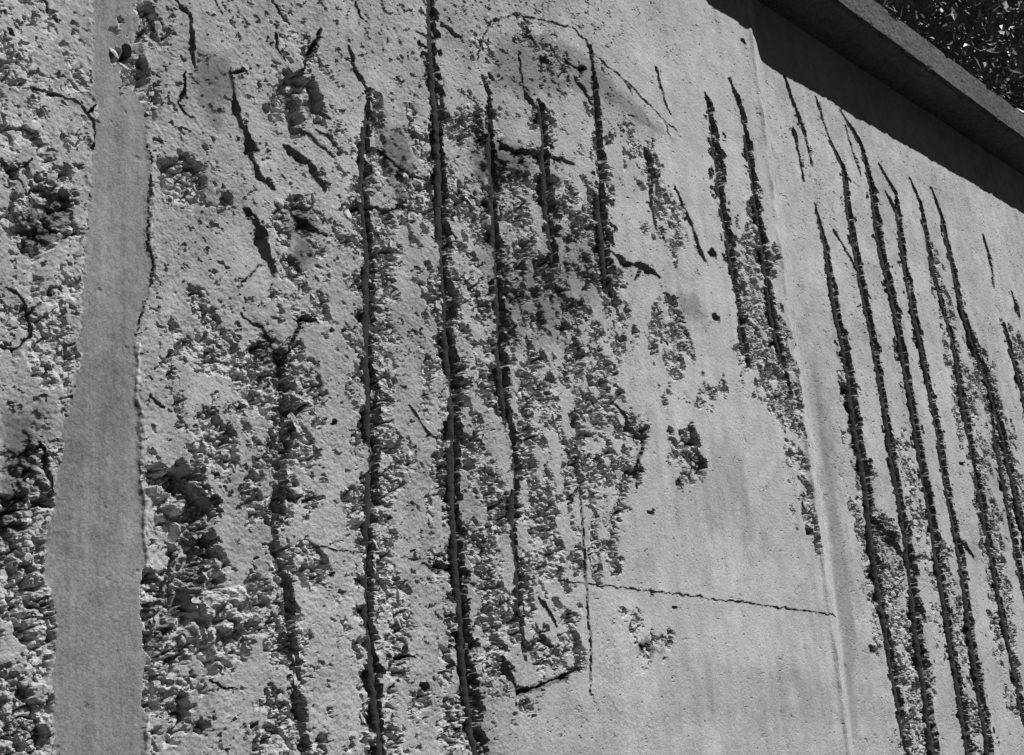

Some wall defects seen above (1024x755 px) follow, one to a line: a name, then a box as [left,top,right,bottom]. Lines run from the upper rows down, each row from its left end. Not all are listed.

crack [0,286,42,354]
spalling [0,405,65,755]
spalling [0,0,99,412]
crack [135,144,156,333]
spalling [139,2,824,755]
crack [483,401,837,708]
spalling [836,370,984,755]
spalling [929,235,1024,723]